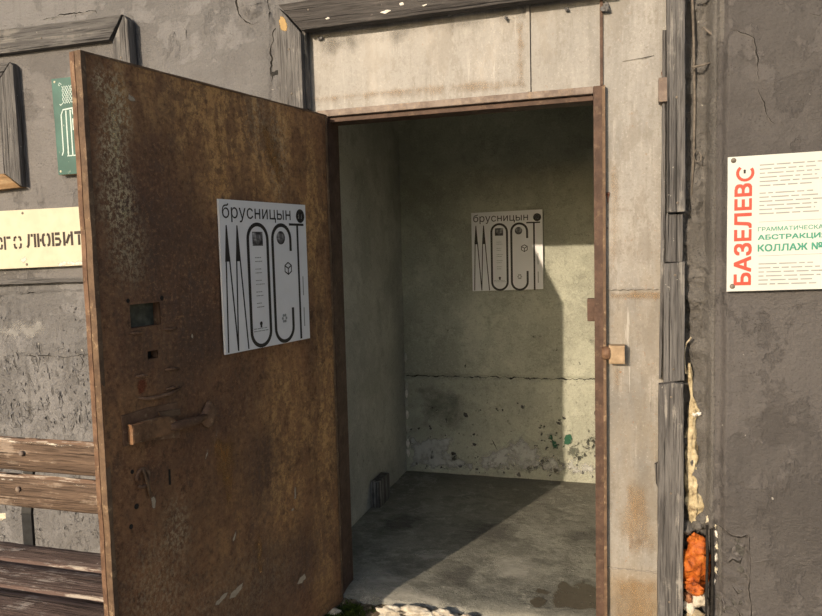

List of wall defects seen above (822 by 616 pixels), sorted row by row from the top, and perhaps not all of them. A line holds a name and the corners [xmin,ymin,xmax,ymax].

crack [734,30,775,124]
spalling [677,0,753,616]
peeling [475,416,595,478]
damp [530,581,596,610]